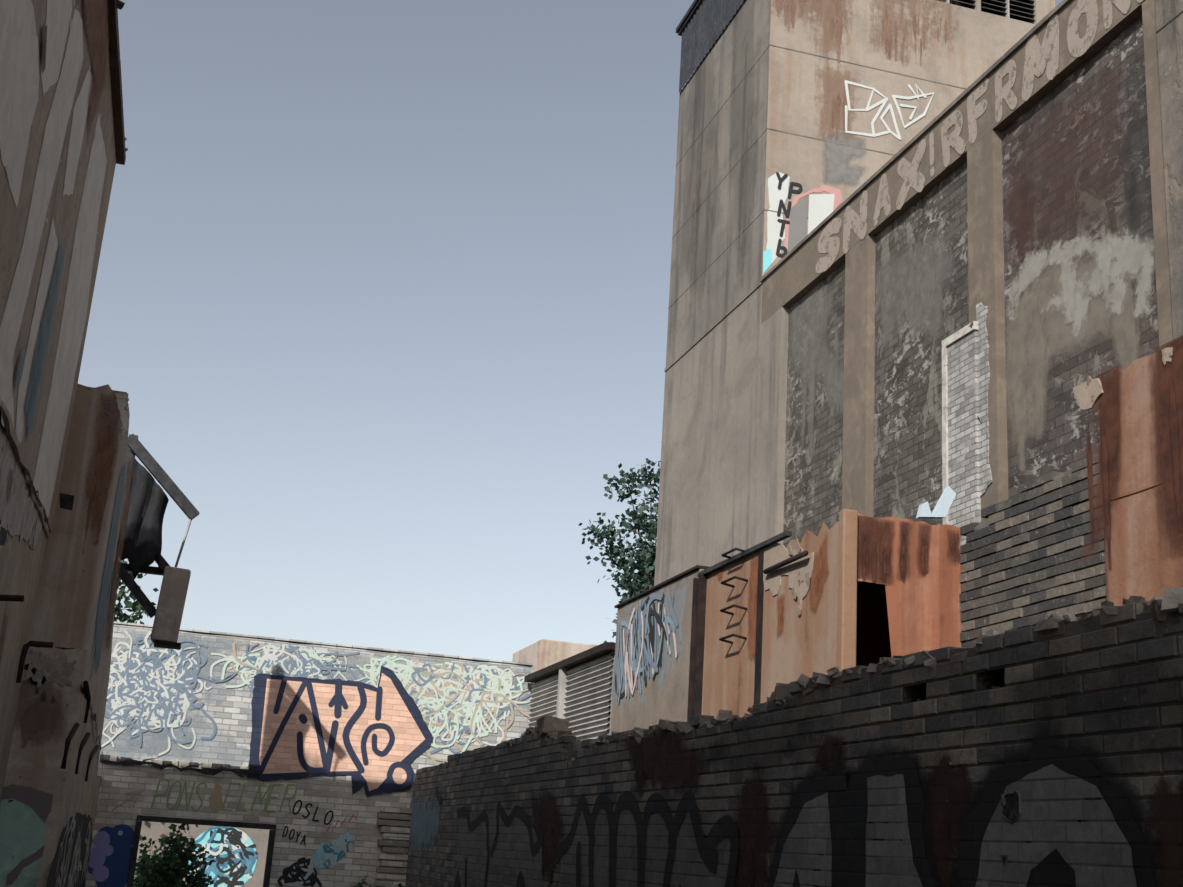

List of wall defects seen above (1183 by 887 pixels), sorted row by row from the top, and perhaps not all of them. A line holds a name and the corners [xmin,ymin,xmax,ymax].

rust [773,0,854,139]
rust [873,0,951,61]
peeling [0,0,107,554]
flaking render [974,302,993,496]
rust [1085,366,1120,568]
rust [1152,335,1183,549]
rust [857,515,930,583]
rust [949,532,960,560]
spalling [22,648,76,688]
spalling [976,668,1005,691]